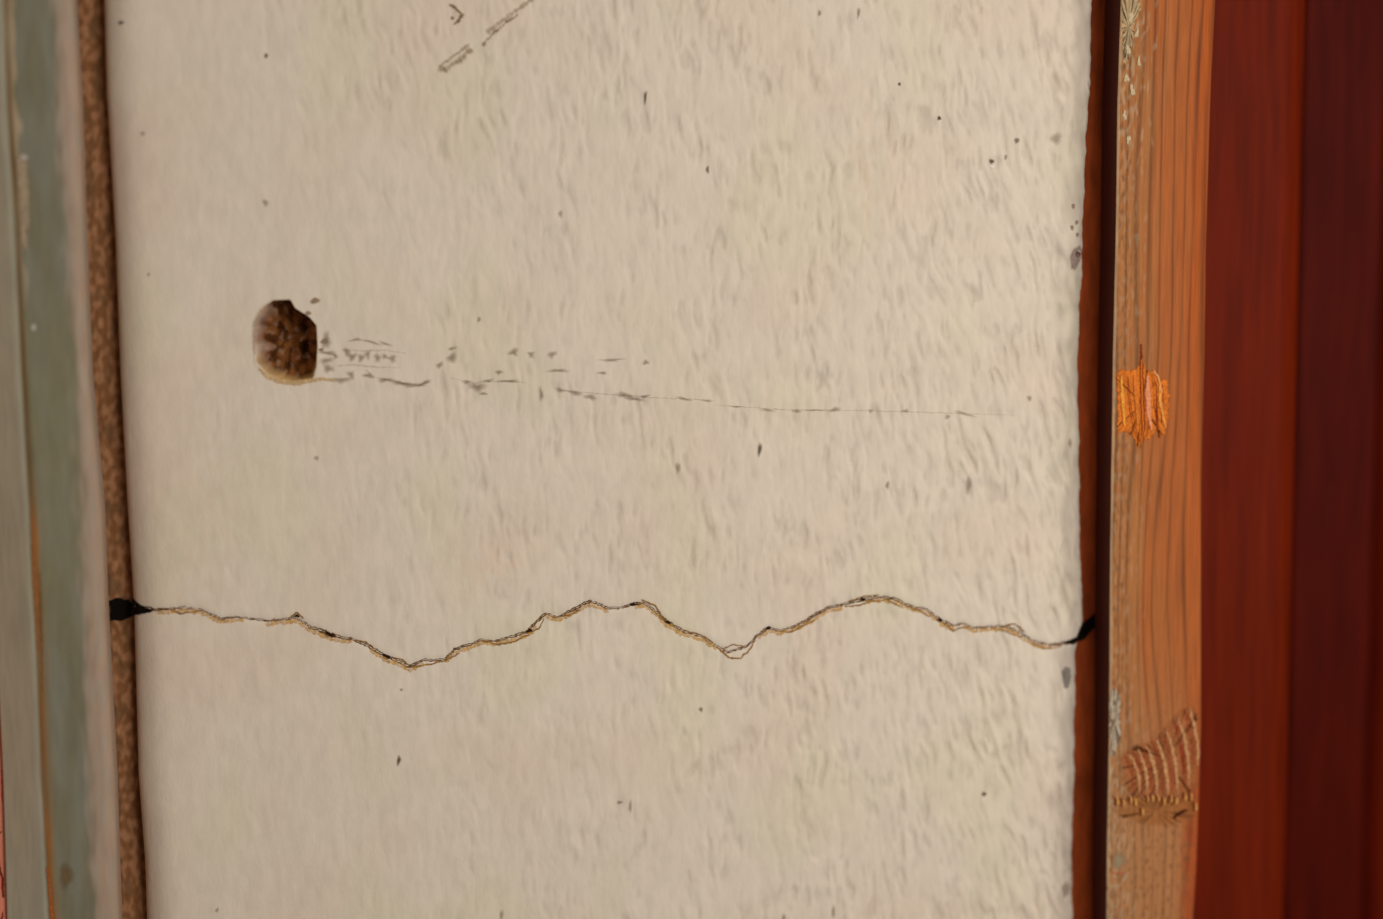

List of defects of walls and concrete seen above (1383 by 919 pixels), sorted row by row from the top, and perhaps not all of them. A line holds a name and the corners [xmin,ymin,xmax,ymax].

crack [109,595,1095,671]